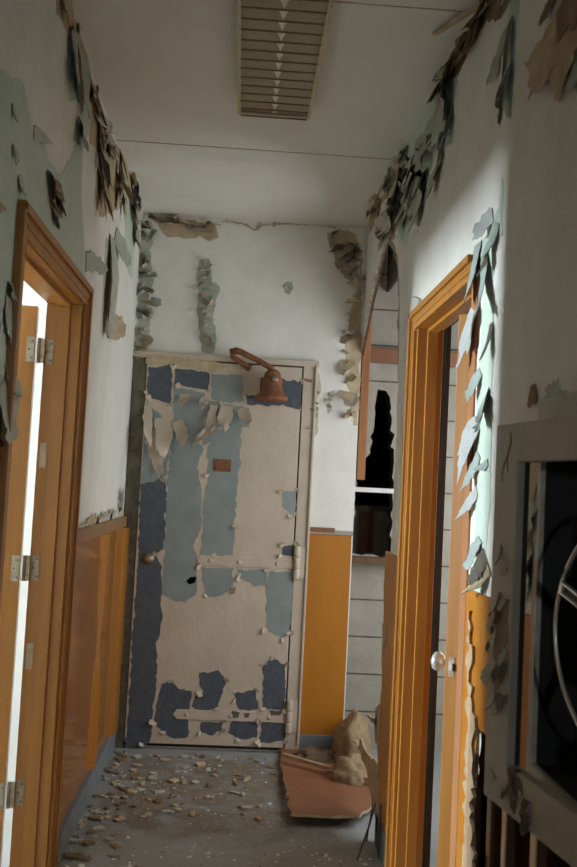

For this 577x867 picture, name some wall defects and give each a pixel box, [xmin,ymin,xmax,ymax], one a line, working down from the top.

peeling [365,0,577,251]
peeling [0,0,366,748]
peeling [454,178,510,716]
peeling [525,462,538,602]
peeling [527,378,567,408]
peeling [487,768,530,837]